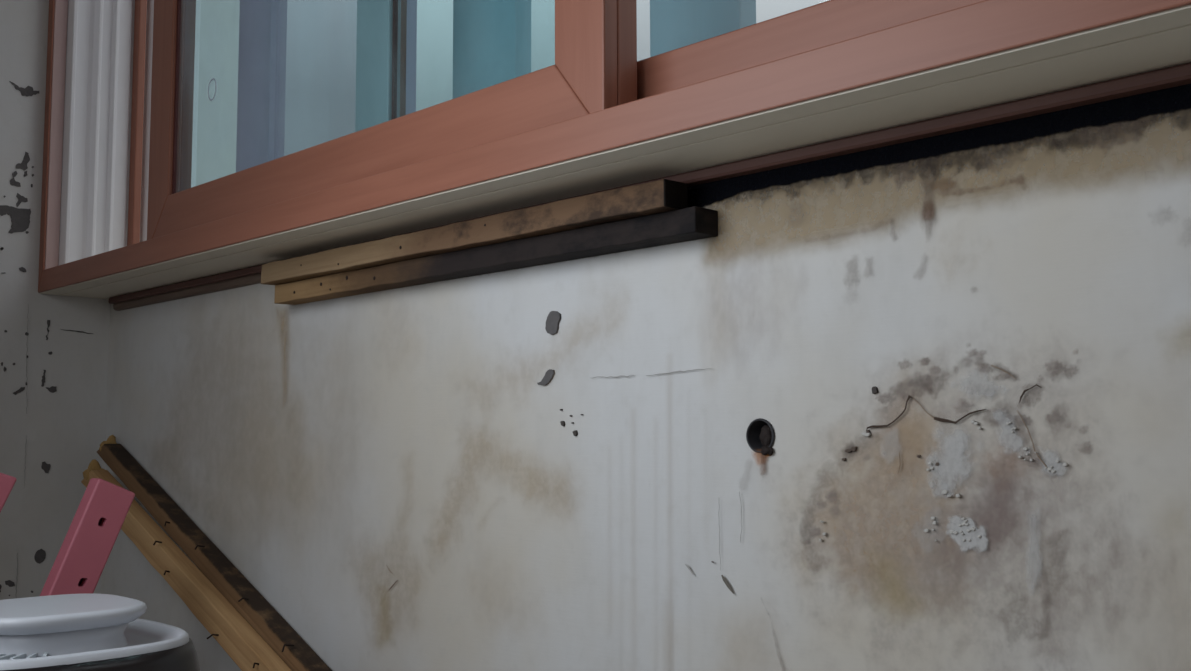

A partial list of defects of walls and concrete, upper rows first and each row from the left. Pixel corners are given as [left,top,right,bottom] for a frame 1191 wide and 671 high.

peeling [10,81,39,96]
peeling [0,152,34,234]
damp [687,84,1191,254]
crack [866,395,986,431]
crack [991,365,1048,468]
peeling [917,420,982,497]
peeling [924,516,988,552]